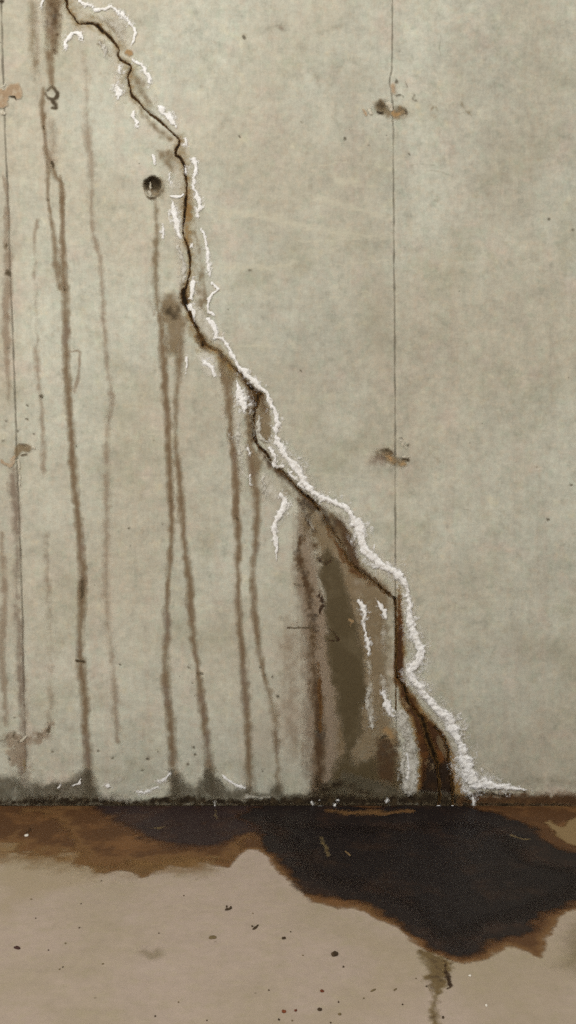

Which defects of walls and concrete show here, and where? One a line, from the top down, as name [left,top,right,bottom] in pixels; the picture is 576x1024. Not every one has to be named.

crack [65,0,454,805]
leakage [0,0,576,806]
leakage [418,950,452,1024]